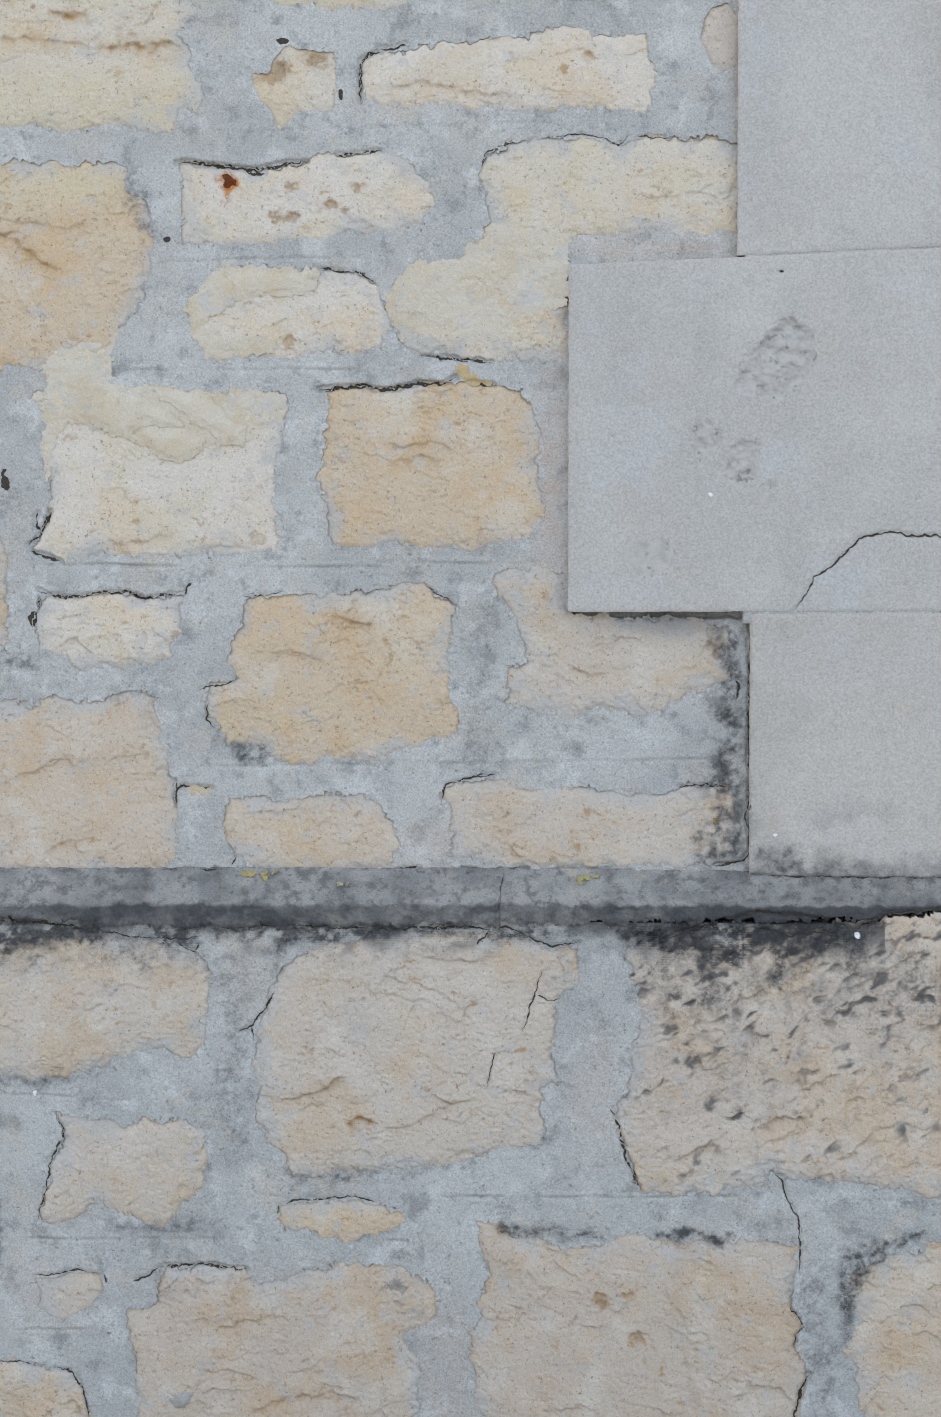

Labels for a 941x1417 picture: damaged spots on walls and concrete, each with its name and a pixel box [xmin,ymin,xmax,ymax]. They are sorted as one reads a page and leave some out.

corrosion [220,174,238,195]
spalling [732,313,818,403]
spalling [723,437,763,490]
crack [792,531,941,612]